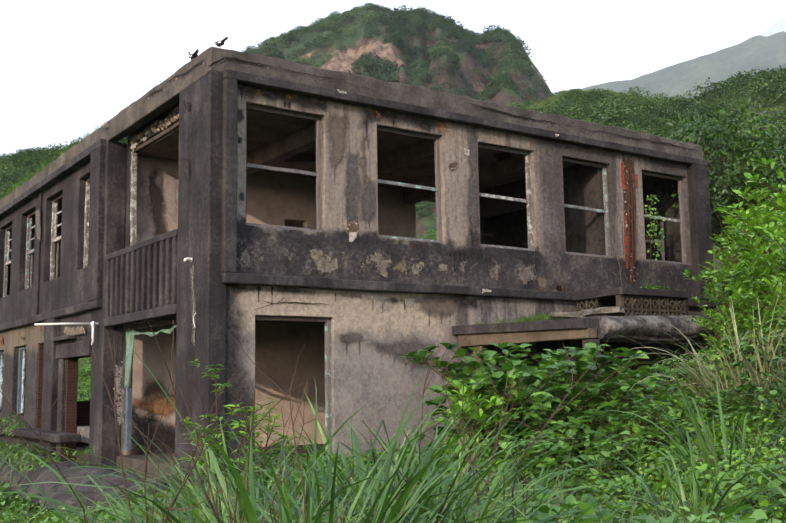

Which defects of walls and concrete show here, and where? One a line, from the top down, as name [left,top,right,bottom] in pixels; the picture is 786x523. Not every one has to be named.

leakage [238,84,438,227]
spalling [347,223,359,242]
corrosion [621,159,638,285]
flaking render [310,249,339,275]
flaking render [359,252,428,277]
flaking render [516,264,536,284]
leakage [228,284,261,301]
leakage [271,287,316,295]
leakage [371,295,478,327]
leakage [340,332,363,356]